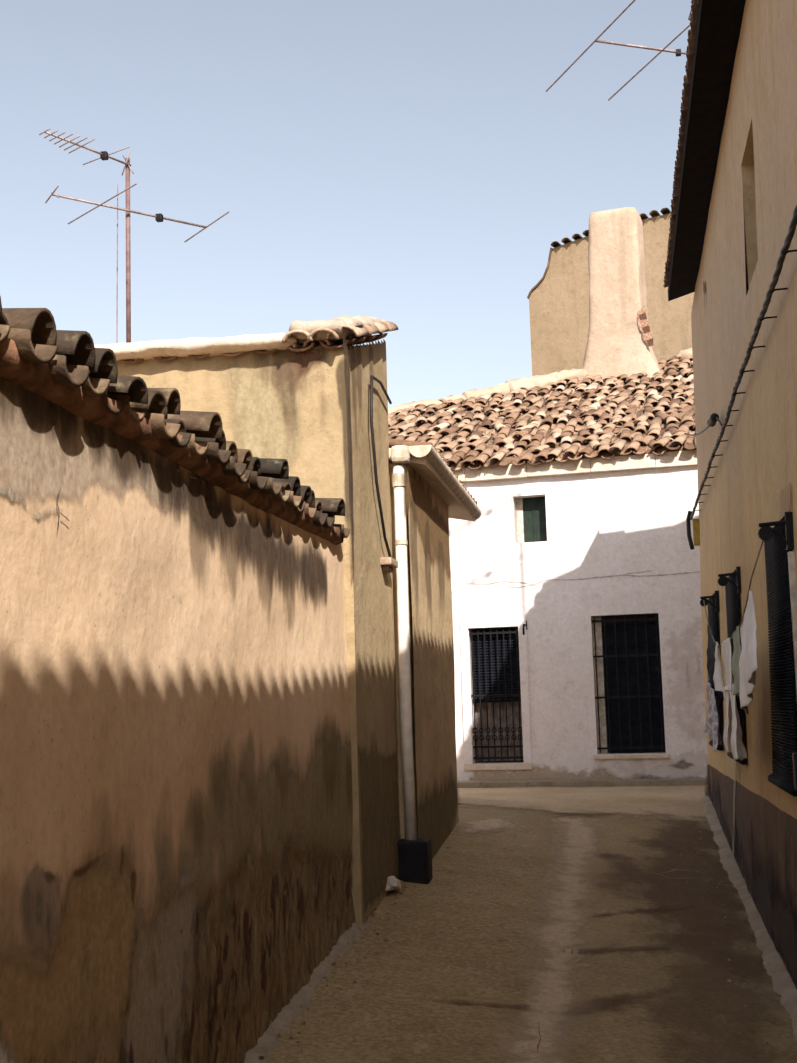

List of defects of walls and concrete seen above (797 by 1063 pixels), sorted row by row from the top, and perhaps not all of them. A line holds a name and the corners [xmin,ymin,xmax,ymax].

flaking render [0,380,197,519]
leakage [0,865,68,969]
flaking render [0,836,355,1063]
leakage [180,732,399,1059]
leakage [470,767,619,781]
leakage [563,761,797,990]